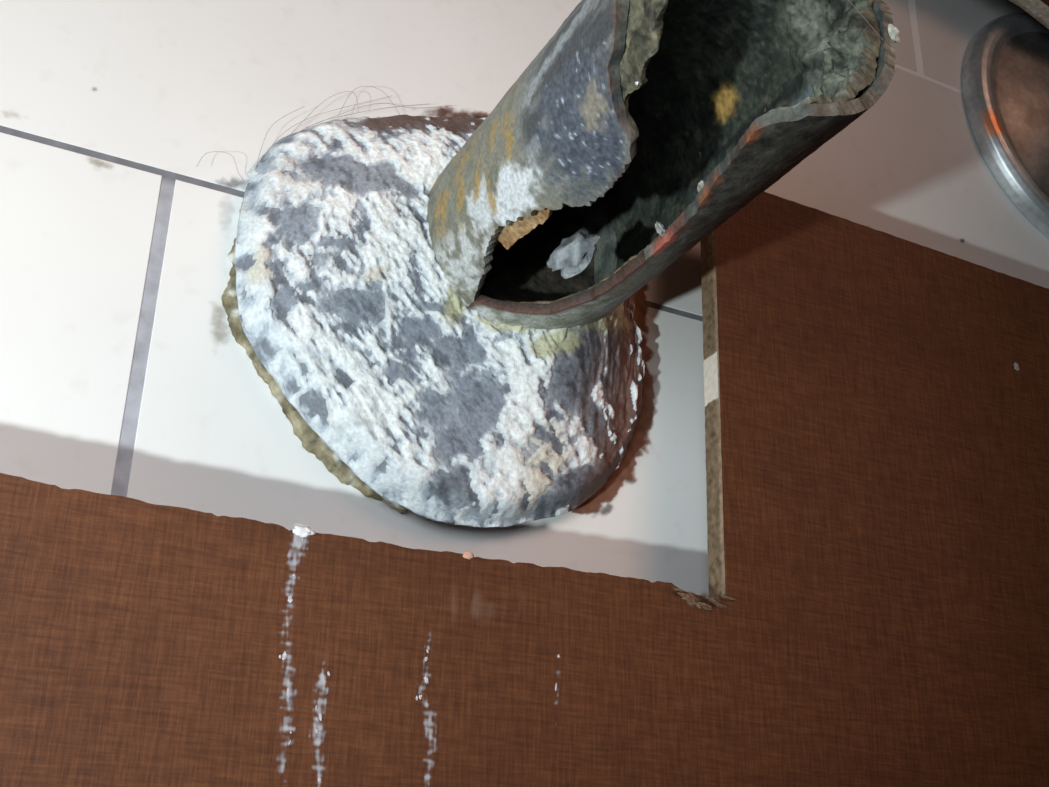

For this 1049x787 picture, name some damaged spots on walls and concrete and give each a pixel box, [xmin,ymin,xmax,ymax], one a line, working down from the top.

leakage [287,524,310,607]
leakage [279,643,296,772]
leakage [314,671,330,784]
leakage [416,674,436,779]